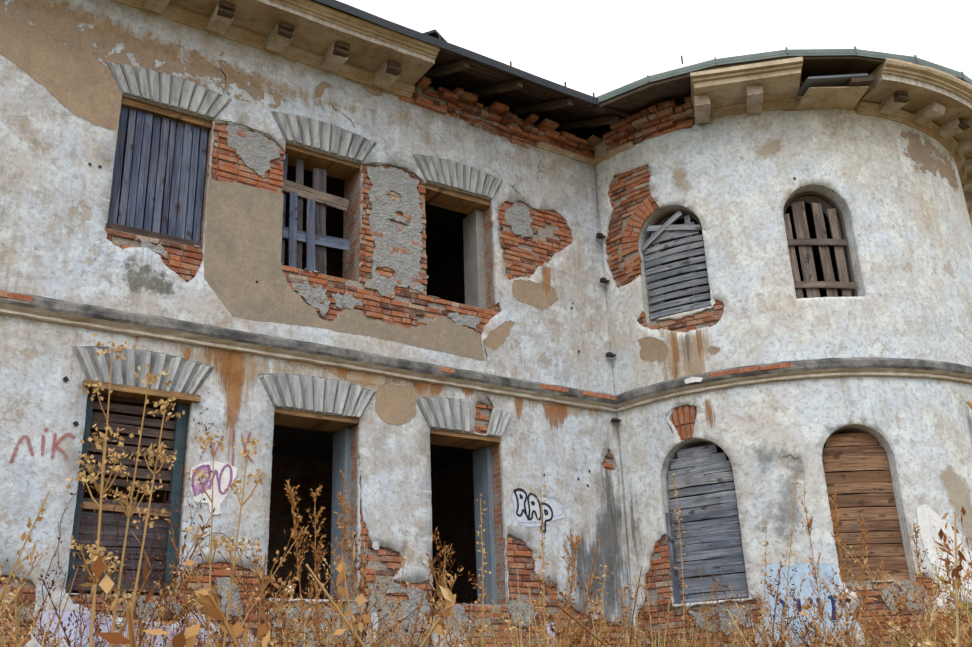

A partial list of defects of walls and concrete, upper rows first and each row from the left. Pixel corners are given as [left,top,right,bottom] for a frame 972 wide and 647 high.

flaking render [346,76,698,159]
peeling [901,130,958,192]
flaking render [105,121,515,361]
flaking render [491,201,573,311]
flaking render [606,165,660,291]
flaking render [637,299,724,362]
flaking render [670,406,697,441]
flaking render [69,509,763,647]
water stain [571,469,634,618]